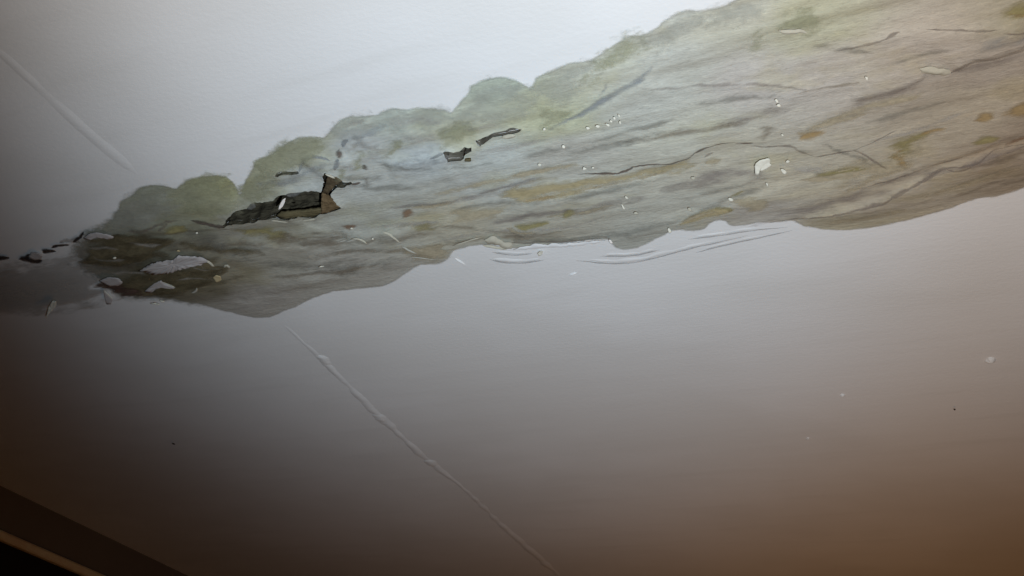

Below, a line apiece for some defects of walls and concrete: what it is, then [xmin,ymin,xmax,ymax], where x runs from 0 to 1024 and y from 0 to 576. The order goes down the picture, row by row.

peeling [83,140,360,305]
spalling [430,128,521,162]
water stain [74,0,1024,318]